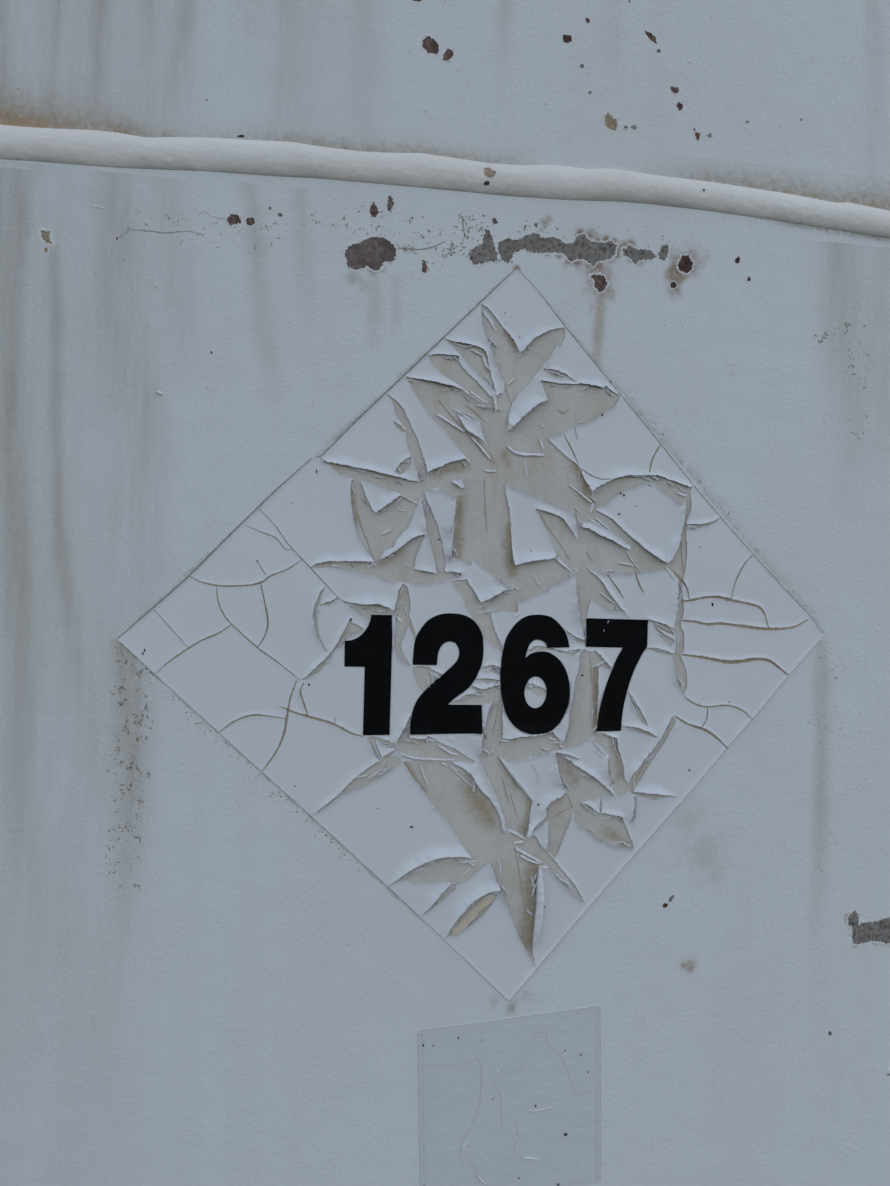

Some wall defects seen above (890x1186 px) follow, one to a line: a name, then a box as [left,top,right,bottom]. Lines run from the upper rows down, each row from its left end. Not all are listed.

peeling [342,193,399,274]
peeling [469,217,499,265]
peeling [622,245,696,290]
crack [154,509,363,771]
peeling [302,304,720,967]
crack [668,555,808,676]
crack [675,697,752,749]
peeling [845,908,890,948]